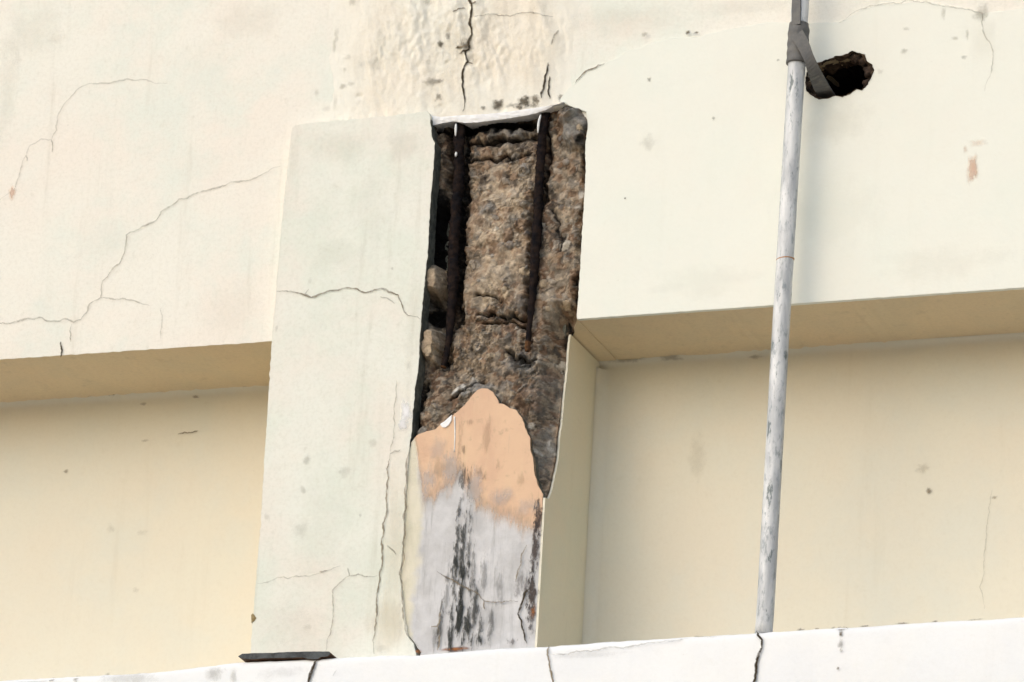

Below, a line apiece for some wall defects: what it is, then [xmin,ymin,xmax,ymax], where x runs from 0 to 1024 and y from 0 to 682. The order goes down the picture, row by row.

crack [453,0,476,110]
spalling [805,51,874,99]
crack [287,287,403,308]
spalling [399,96,588,655]
crack [373,457,408,649]
water stain [437,497,486,653]
water stain [525,501,542,629]
crack [753,631,763,682]